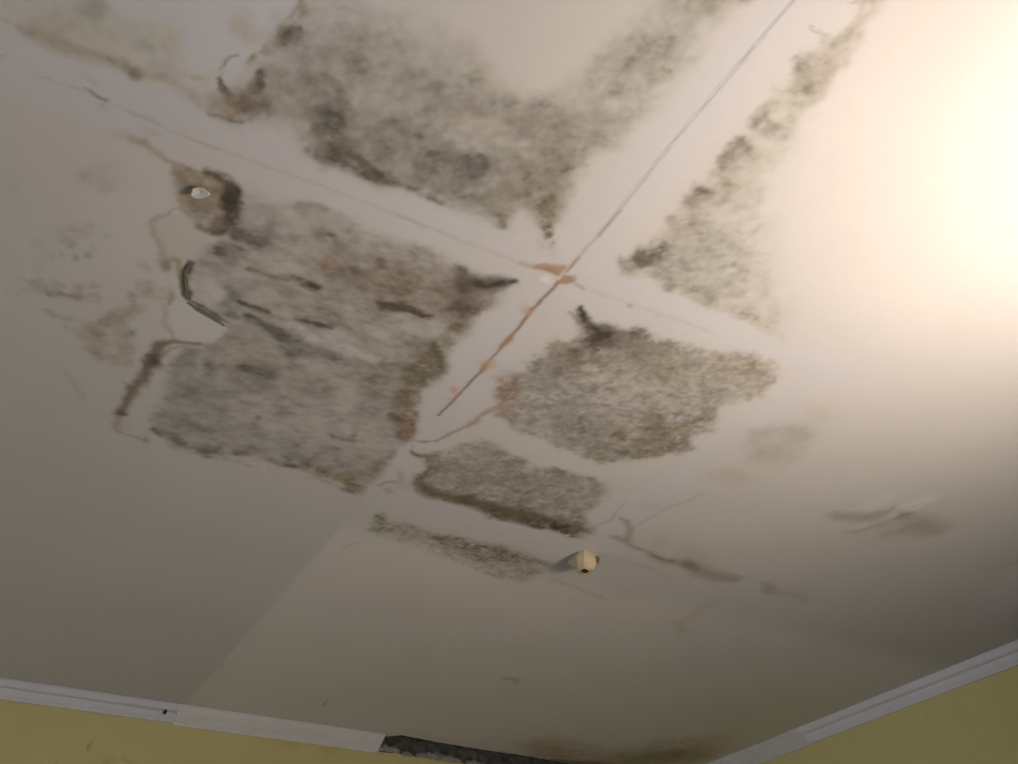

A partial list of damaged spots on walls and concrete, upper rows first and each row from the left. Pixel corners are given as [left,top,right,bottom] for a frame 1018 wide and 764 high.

leakage [0,0,897,541]
crack [567,0,796,273]
leakage [338,509,559,585]
flaking render [378,735,570,764]